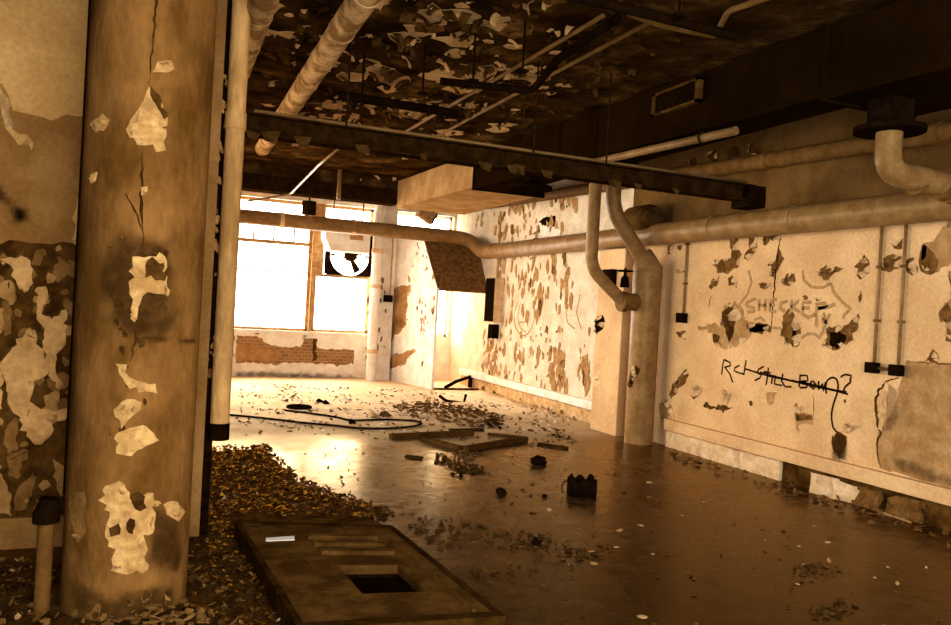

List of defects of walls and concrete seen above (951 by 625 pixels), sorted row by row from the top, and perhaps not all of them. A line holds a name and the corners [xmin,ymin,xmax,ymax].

peeling [0,0,110,150]
peeling [126,86,168,152]
crack [148,0,158,84]
crack [125,148,144,243]
peeling [0,199,86,543]
crack [129,334,138,361]
peeling [107,234,170,456]
flaking render [235,265,435,369]
peeling [481,253,605,414]
peeling [676,301,801,350]
peeling [882,221,951,344]
peeling [99,481,186,575]